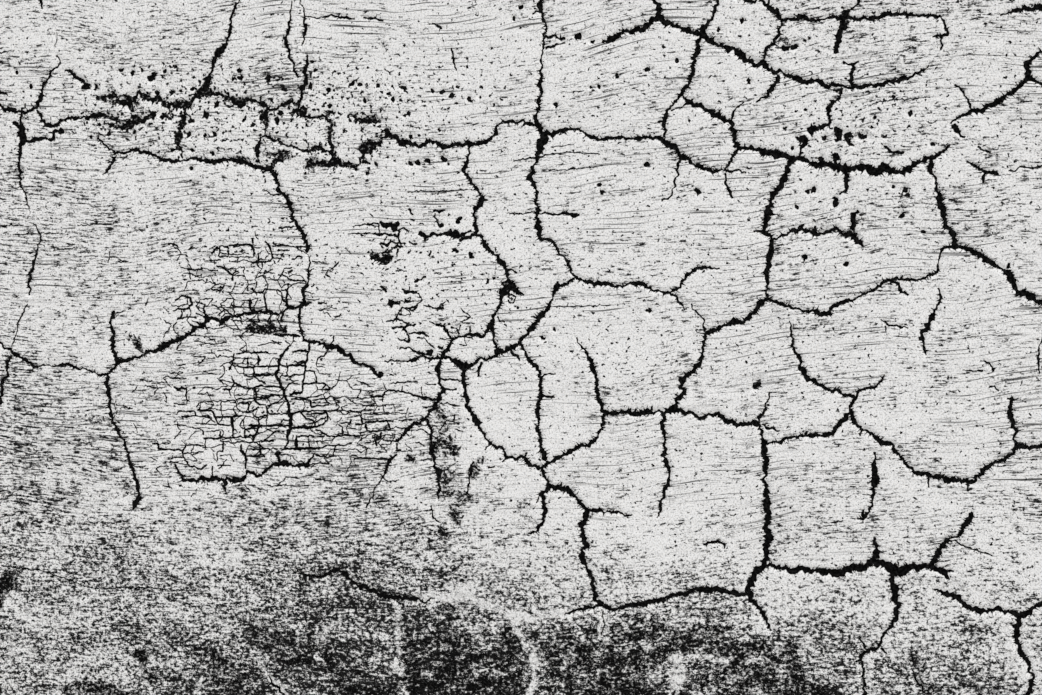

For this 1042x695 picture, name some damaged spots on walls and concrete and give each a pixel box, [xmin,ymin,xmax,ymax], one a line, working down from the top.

crack [203,0,240,92]
crack [282,0,384,110]
crack [0,32,106,208]
crack [26,223,42,295]
crack [97,136,312,260]
crack [367,221,410,256]
crack [0,241,490,511]
crack [384,0,1042,695]
crack [294,567,435,605]
crack [268,676,285,695]